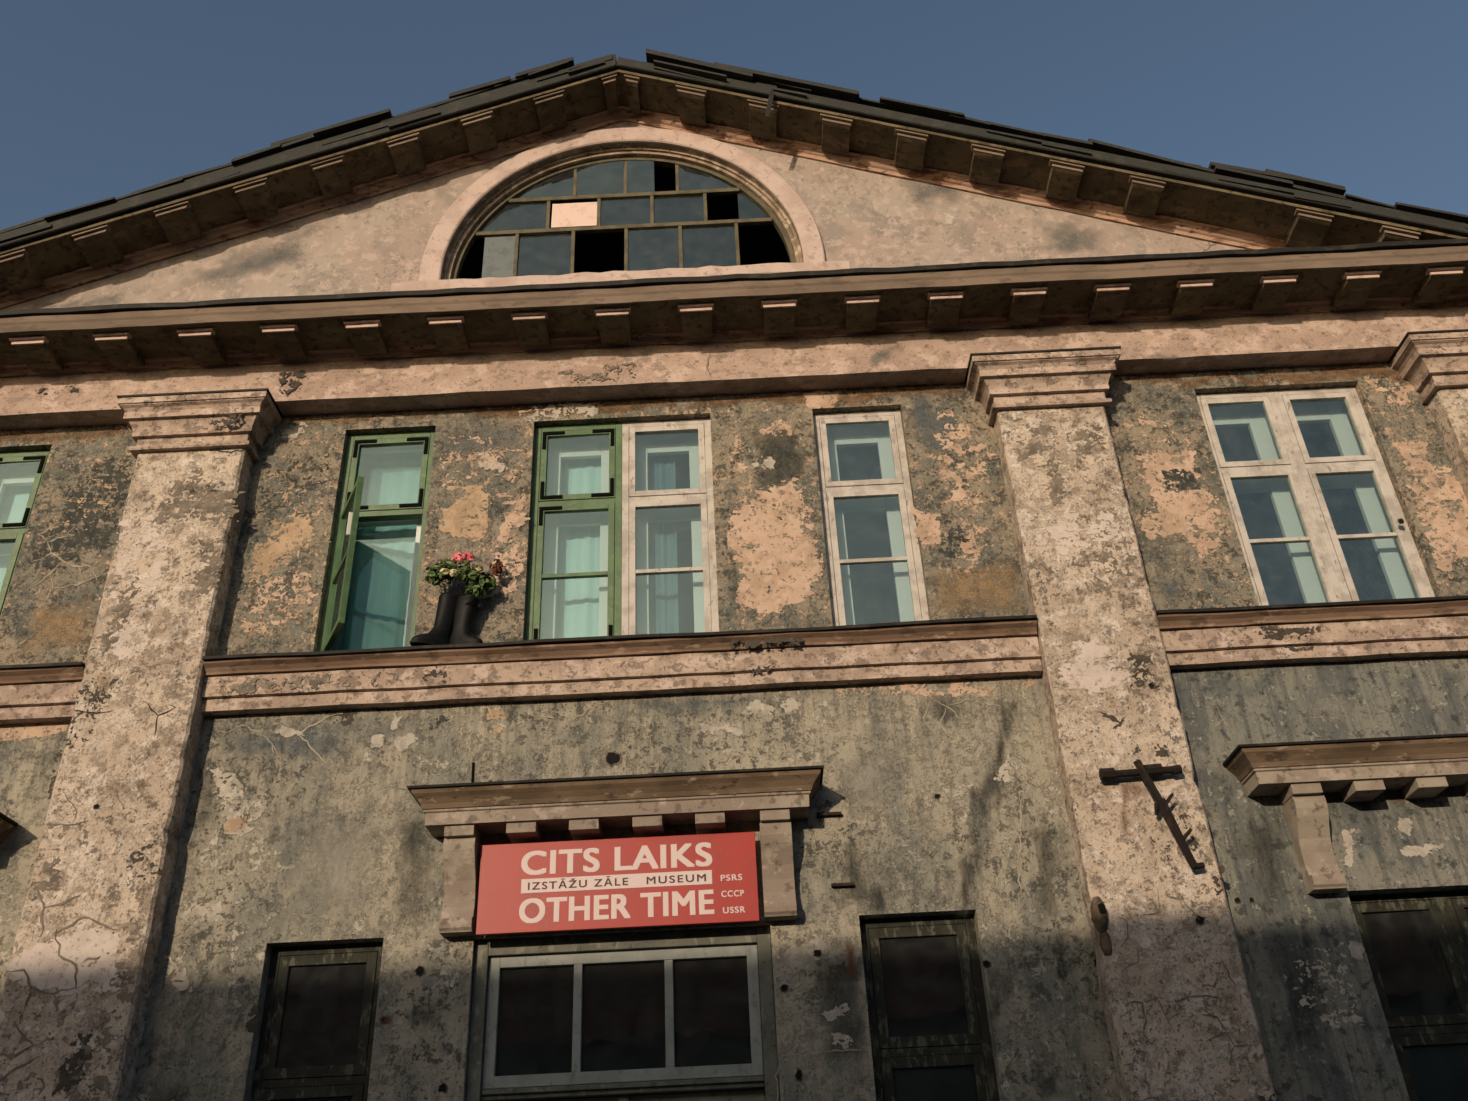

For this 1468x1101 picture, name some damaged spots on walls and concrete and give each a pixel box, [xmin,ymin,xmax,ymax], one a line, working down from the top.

peeling [0,422,331,807]
peeling [438,435,531,601]
peeling [727,418,824,617]
peeling [1013,410,1226,696]
peeling [1391,435,1468,571]
crack [0,881,115,1095]
flaking render [1283,940,1365,1029]